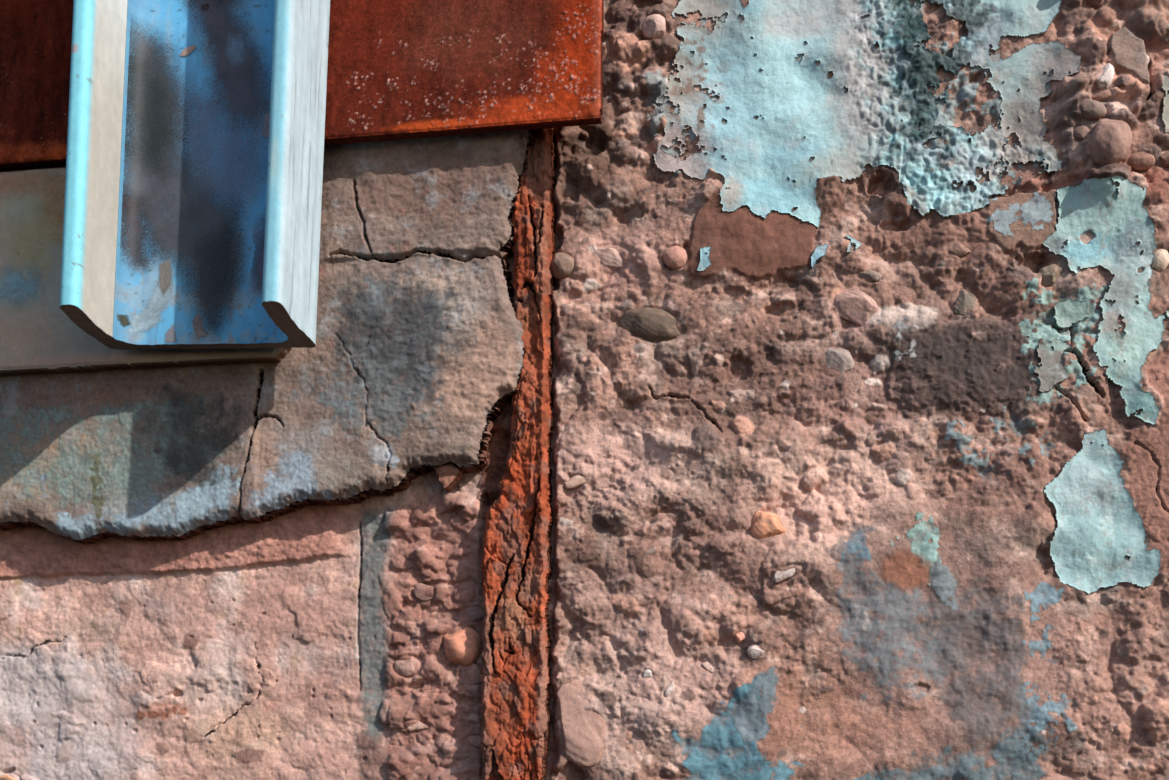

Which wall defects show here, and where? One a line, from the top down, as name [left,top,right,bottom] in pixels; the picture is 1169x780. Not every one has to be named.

damp [125,55,268,206]
damp [120,192,149,270]
crack [336,230,502,263]
crack [517,196,543,332]
peeling [642,0,1169,425]
crack [239,371,281,512]
crack [339,338,390,482]
peeling [939,419,1010,479]
crack [487,479,540,673]
peeling [889,511,958,610]
peeling [1021,429,1161,662]
peeling [854,669,1079,780]